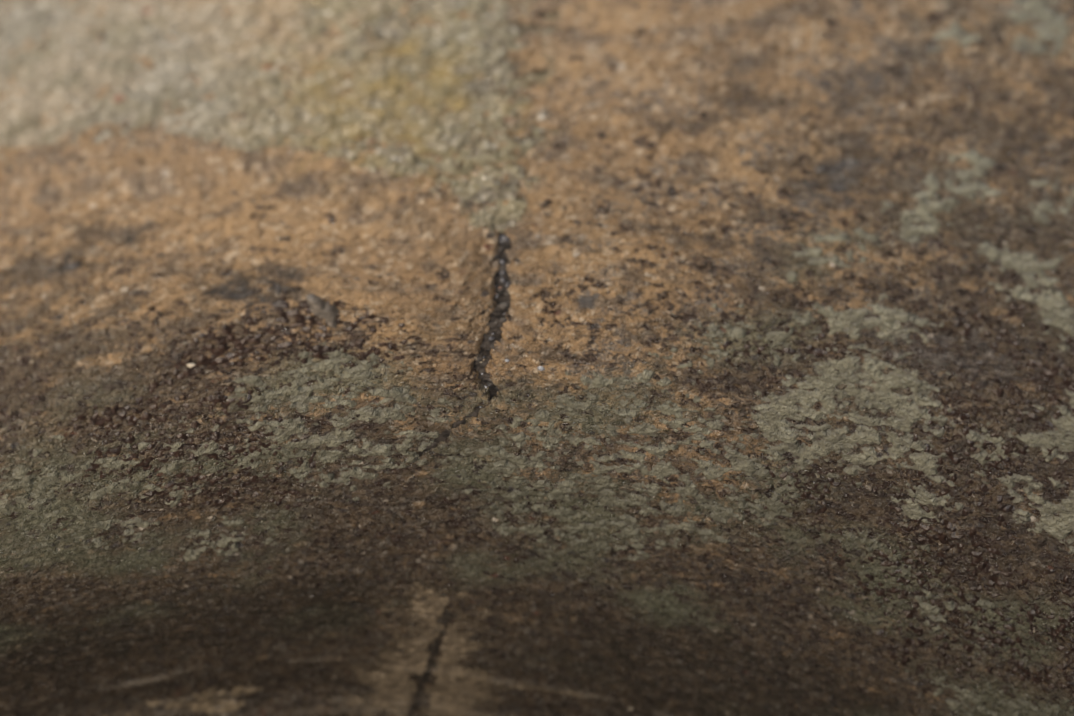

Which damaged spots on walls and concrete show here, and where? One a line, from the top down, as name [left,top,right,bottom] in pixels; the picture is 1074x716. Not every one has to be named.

crack [418,223,512,457]
crack [408,592,454,716]